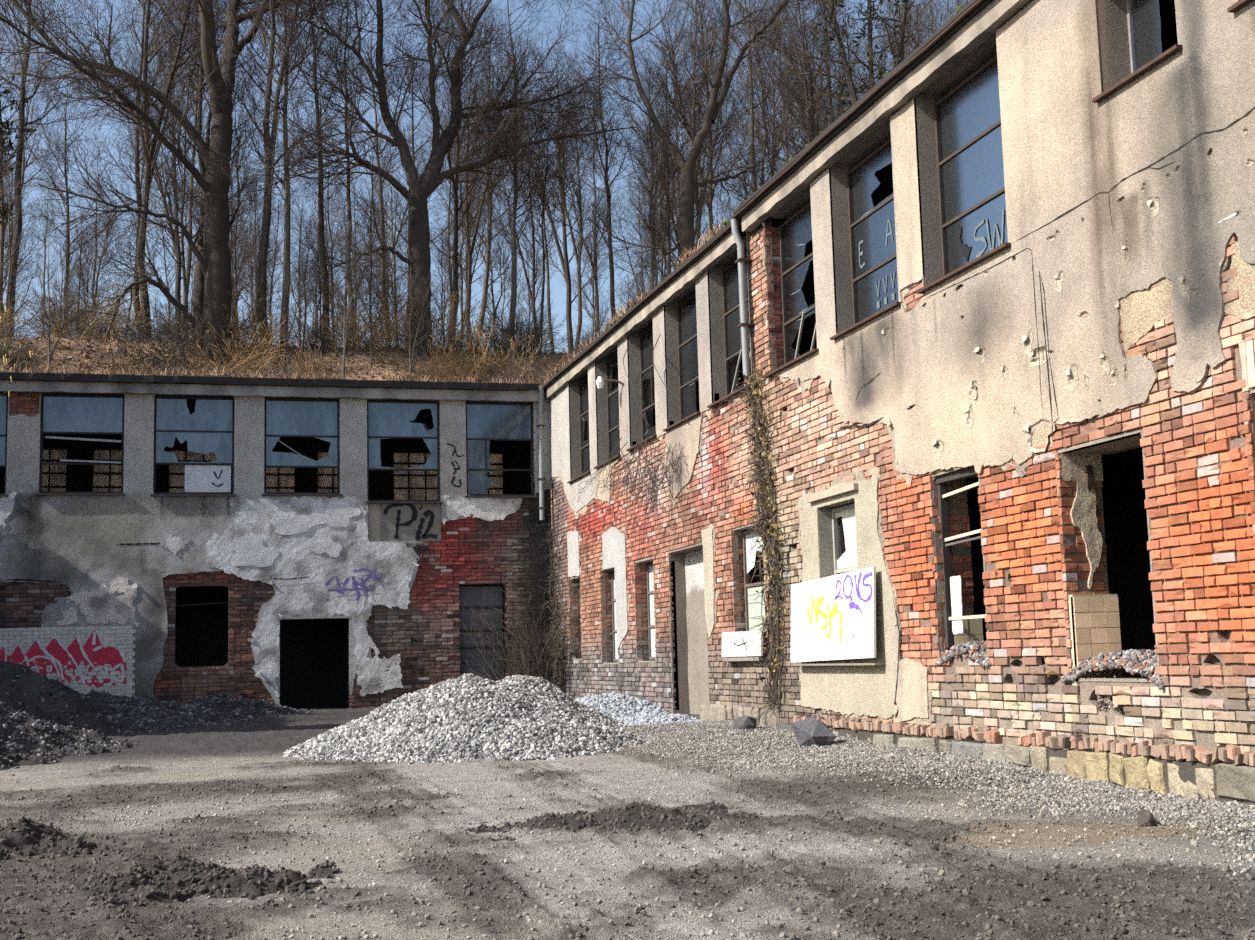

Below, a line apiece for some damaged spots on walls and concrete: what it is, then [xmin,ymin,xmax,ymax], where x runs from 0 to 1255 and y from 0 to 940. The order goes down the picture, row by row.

flaking render [0,577,139,628]
flaking render [153,231,1255,754]